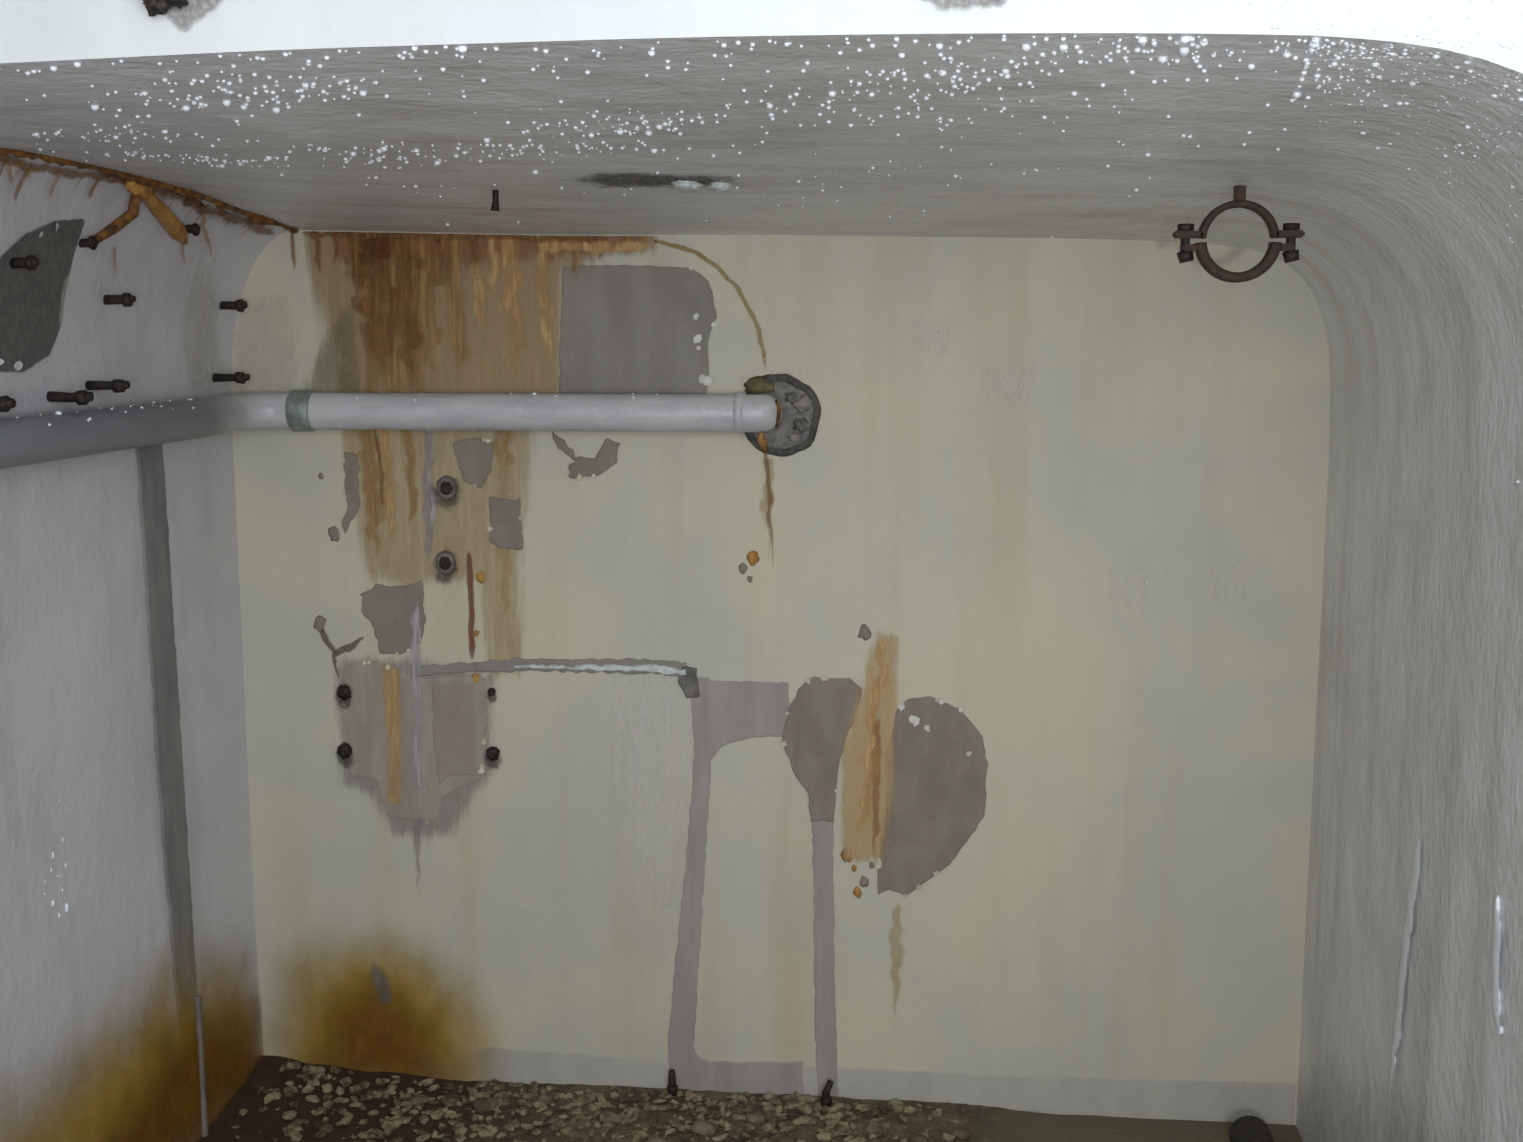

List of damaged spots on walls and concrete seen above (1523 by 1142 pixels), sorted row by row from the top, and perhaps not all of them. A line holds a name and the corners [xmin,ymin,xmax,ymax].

peeling [0,219,84,372]
rust [94,180,211,268]
rust [291,231,653,393]
peeling [559,265,717,394]
leakage [582,174,733,193]
rust [467,553,485,683]
spalling [341,580,488,869]
rust [840,624,896,898]
spalling [875,696,988,898]
leakage [10,987,260,1142]
leakage [292,961,469,1078]
leakage [1491,895,1503,1036]